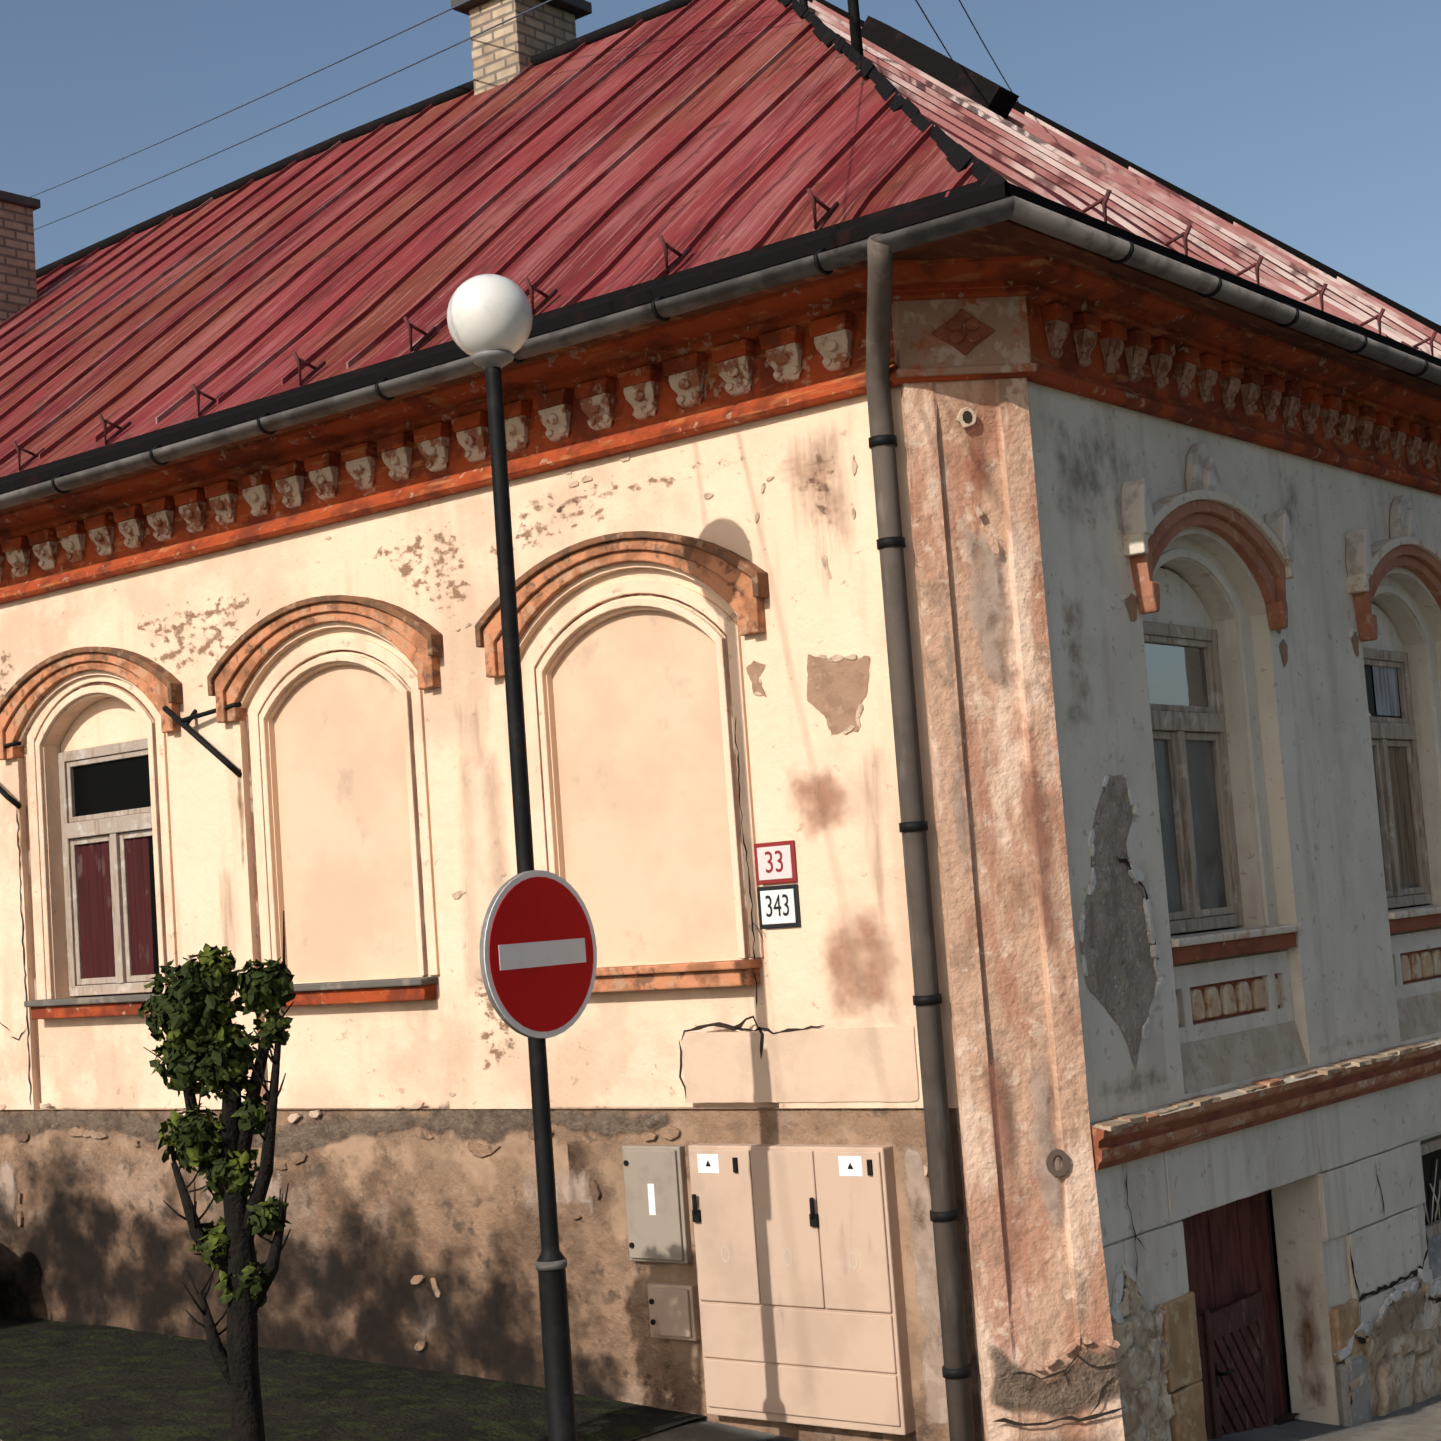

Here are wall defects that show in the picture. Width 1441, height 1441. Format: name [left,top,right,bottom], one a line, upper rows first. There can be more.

peeling [375,532,470,609]
peeling [138,598,260,669]
peeling [806,654,870,736]
leakage [799,777,839,825]
crack [679,719,824,1097]
leakage [830,924,882,998]
flaking render [1077,774,1163,1068]
leakage [0,1157,227,1343]
leakage [254,1226,545,1388]
leakage [572,1356,616,1401]
crack [992,1335,1125,1426]
flaking render [988,1265,1175,1441]